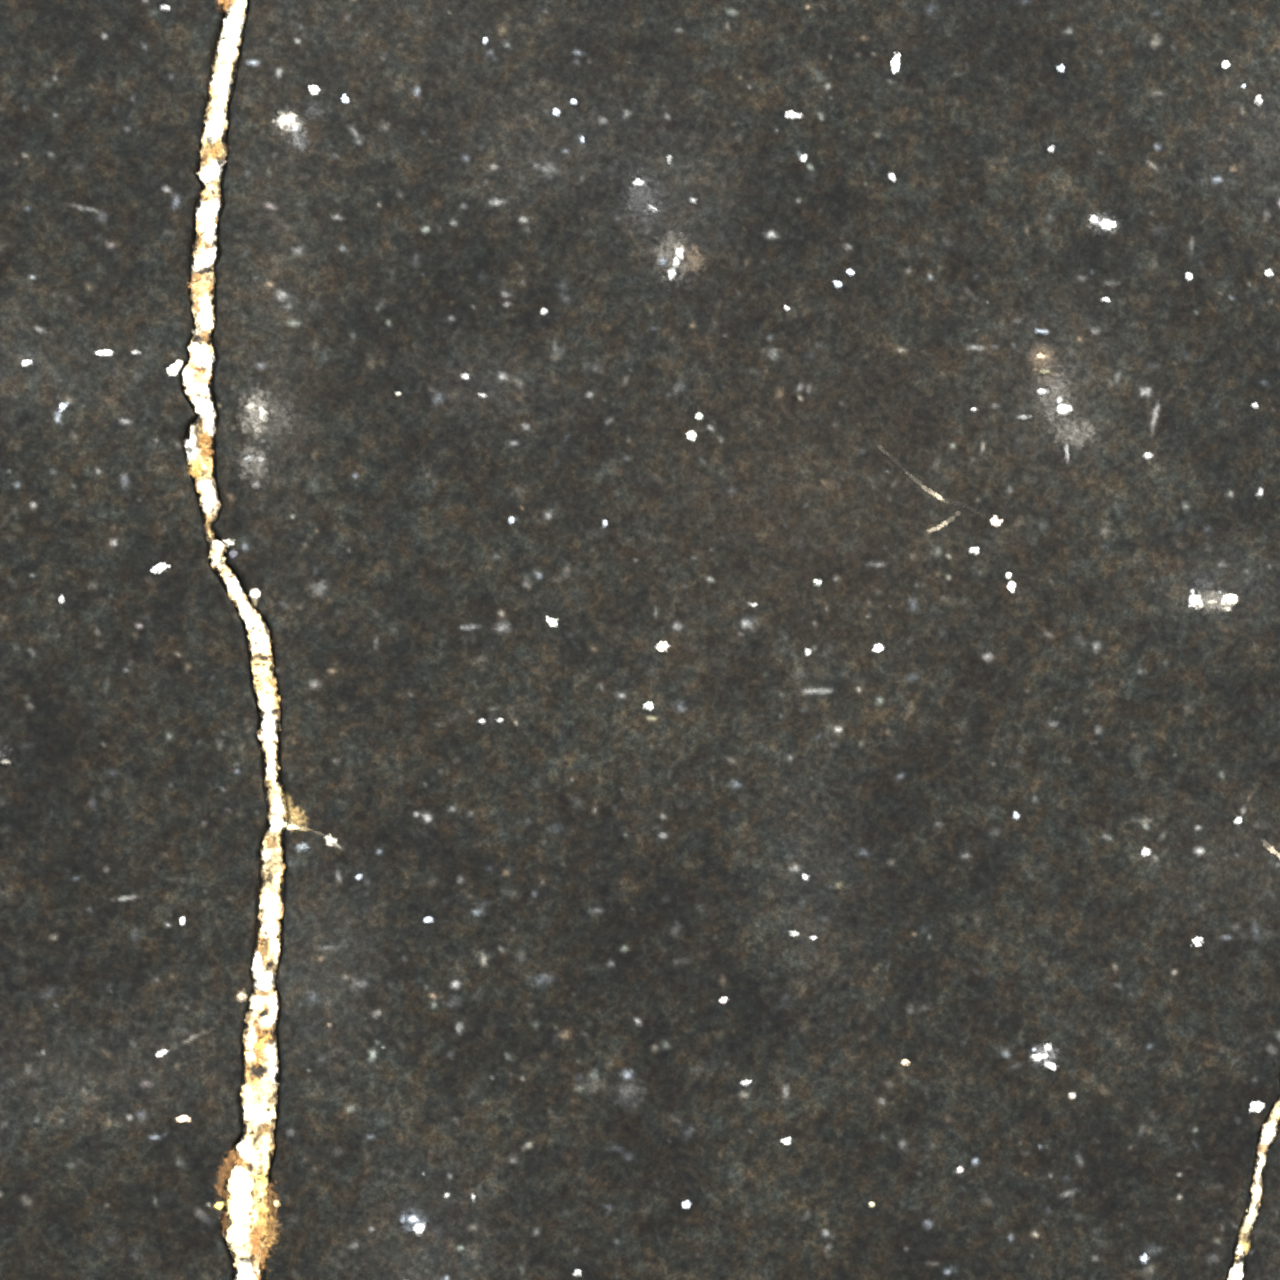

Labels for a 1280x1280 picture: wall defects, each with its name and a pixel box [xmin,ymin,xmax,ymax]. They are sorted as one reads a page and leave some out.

crack [168,0,340,1280]
crack [1228,1101,1280,1280]